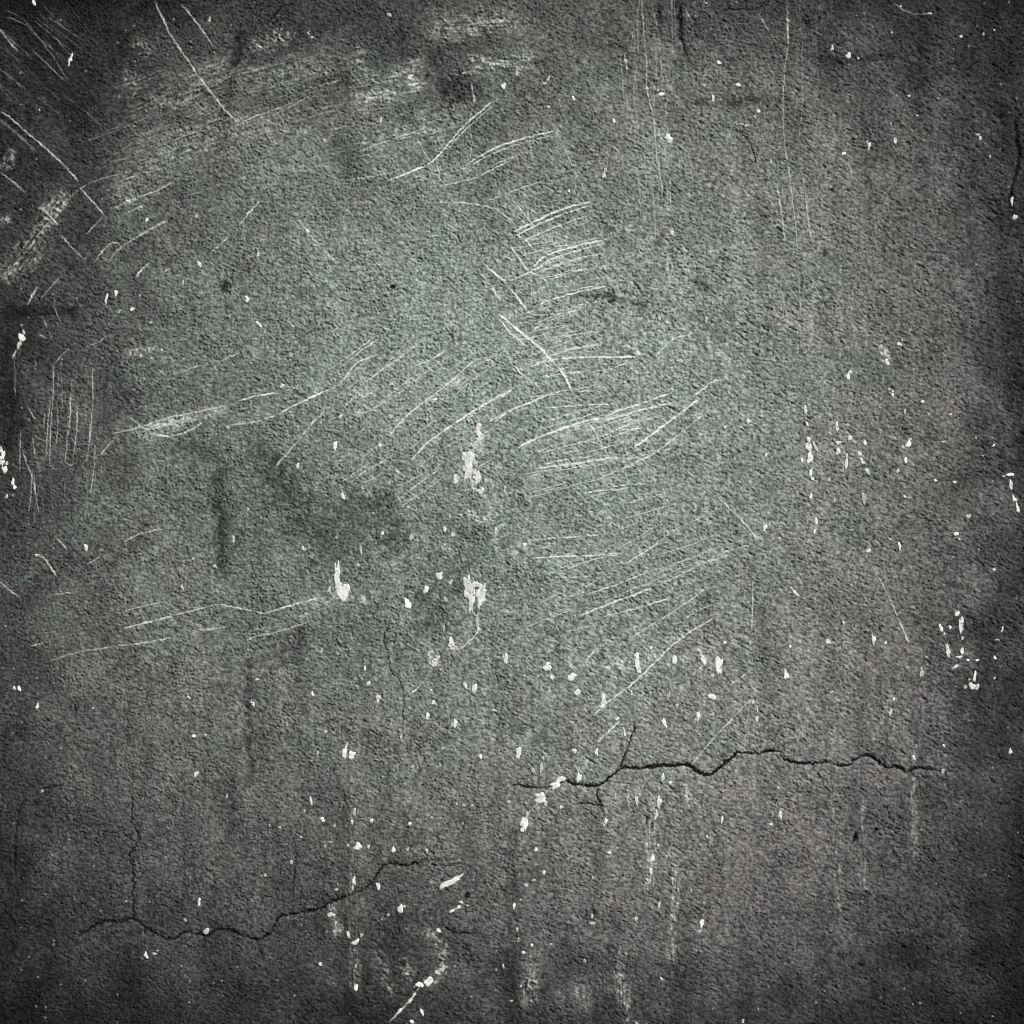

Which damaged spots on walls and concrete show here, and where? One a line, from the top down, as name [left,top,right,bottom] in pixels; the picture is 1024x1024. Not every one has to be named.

crack [515,721,941,813]
crack [79,802,466,960]